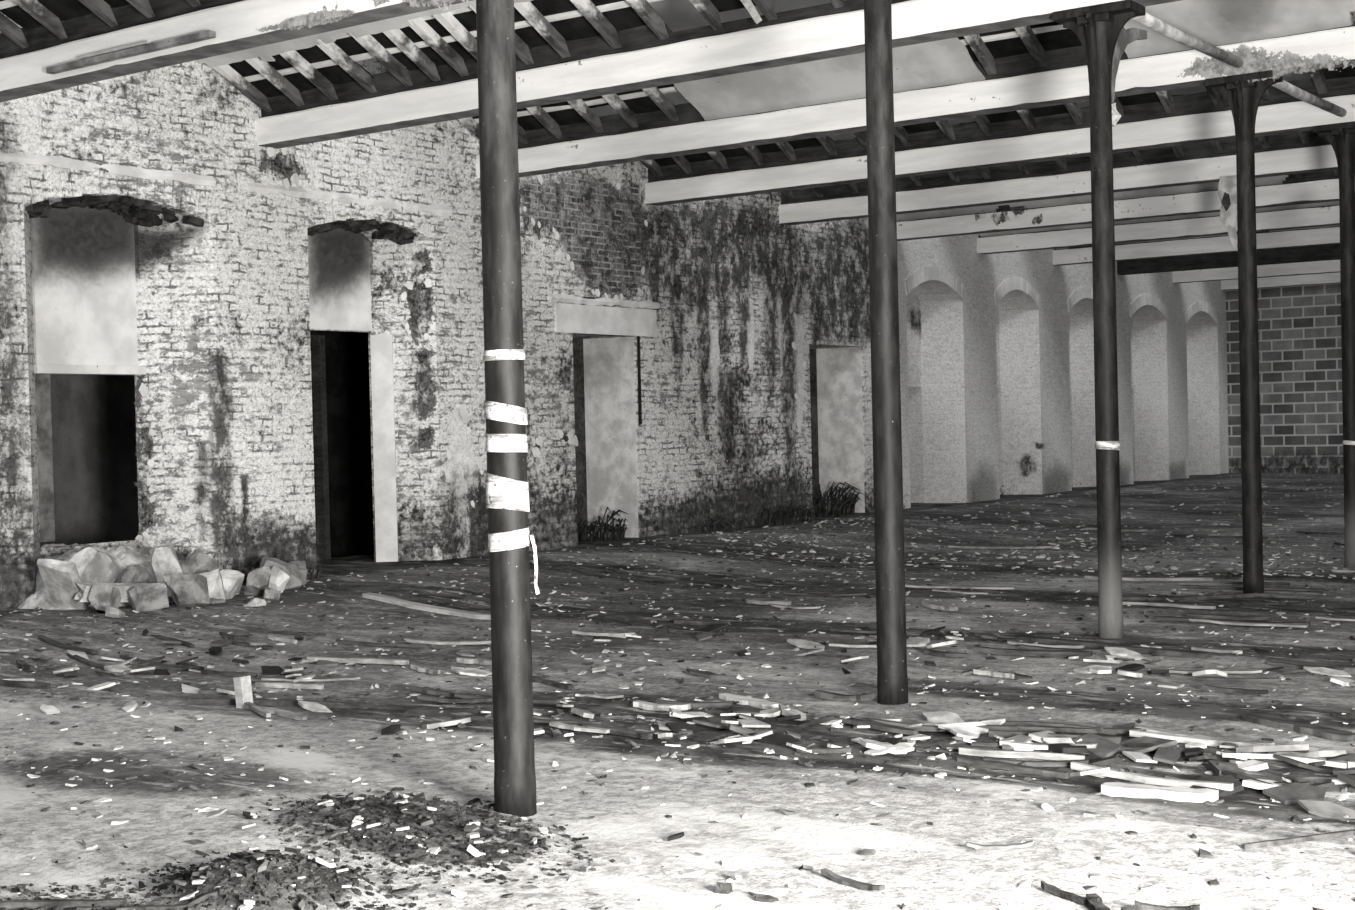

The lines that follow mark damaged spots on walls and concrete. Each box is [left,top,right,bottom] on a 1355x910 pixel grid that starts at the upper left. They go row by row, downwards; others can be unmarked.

flaking render [253,144,306,189]
water stain [0,123,37,610]
spalling [134,375,159,542]
peeling [307,217,487,558]